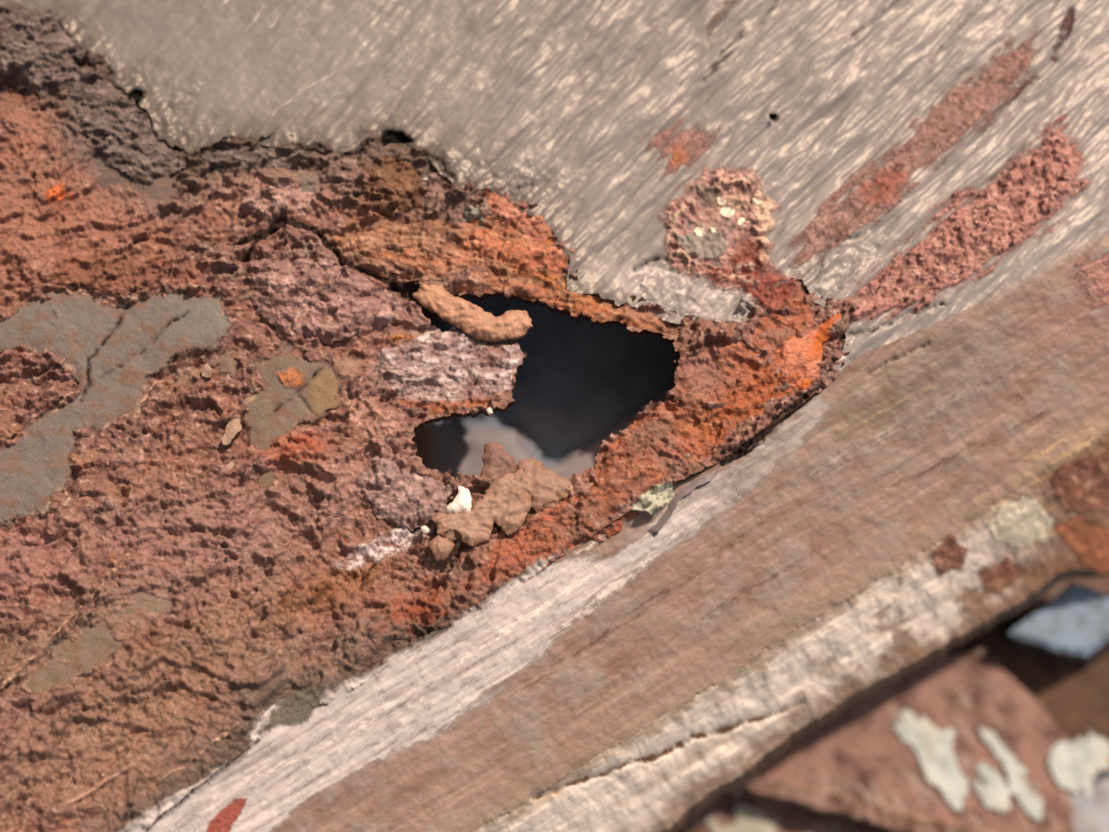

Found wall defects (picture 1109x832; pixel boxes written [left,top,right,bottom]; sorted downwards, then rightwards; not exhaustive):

spalling [128,90,143,105]
spalling [381,131,413,146]
corrosion [790,34,1040,268]
peeling [464,206,493,229]
crack [227,218,412,299]
peeling [413,284,533,342]
corrosion [650,115,1090,489]
corrosion [0,0,796,832]
peeling [421,442,594,562]